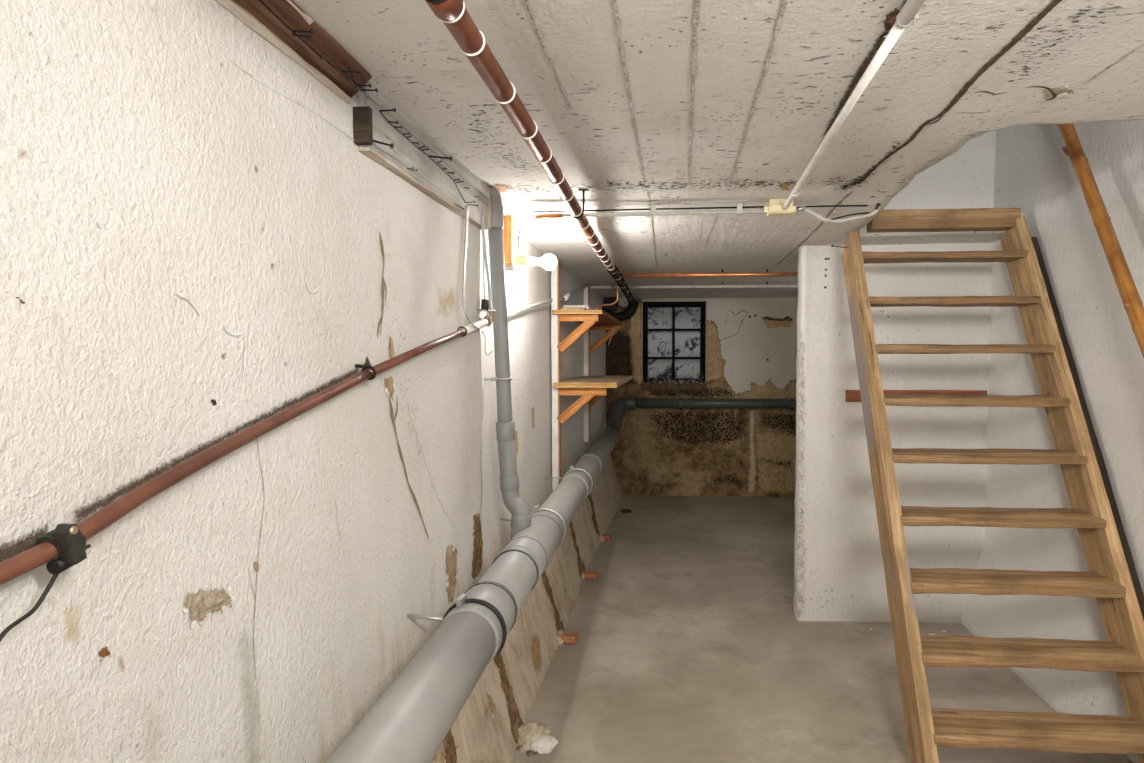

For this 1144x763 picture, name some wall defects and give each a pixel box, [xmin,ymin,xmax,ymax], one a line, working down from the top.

crack [776,0,1143,266]
crack [377,232,387,335]
crack [389,397,429,539]
flaking render [606,299,807,618]
water stain [646,381,796,493]
flaking render [183,581,235,629]
crack [248,440,264,679]
flaking render [445,544,458,607]
flaking render [430,728,455,763]
spalling [485,692,523,743]